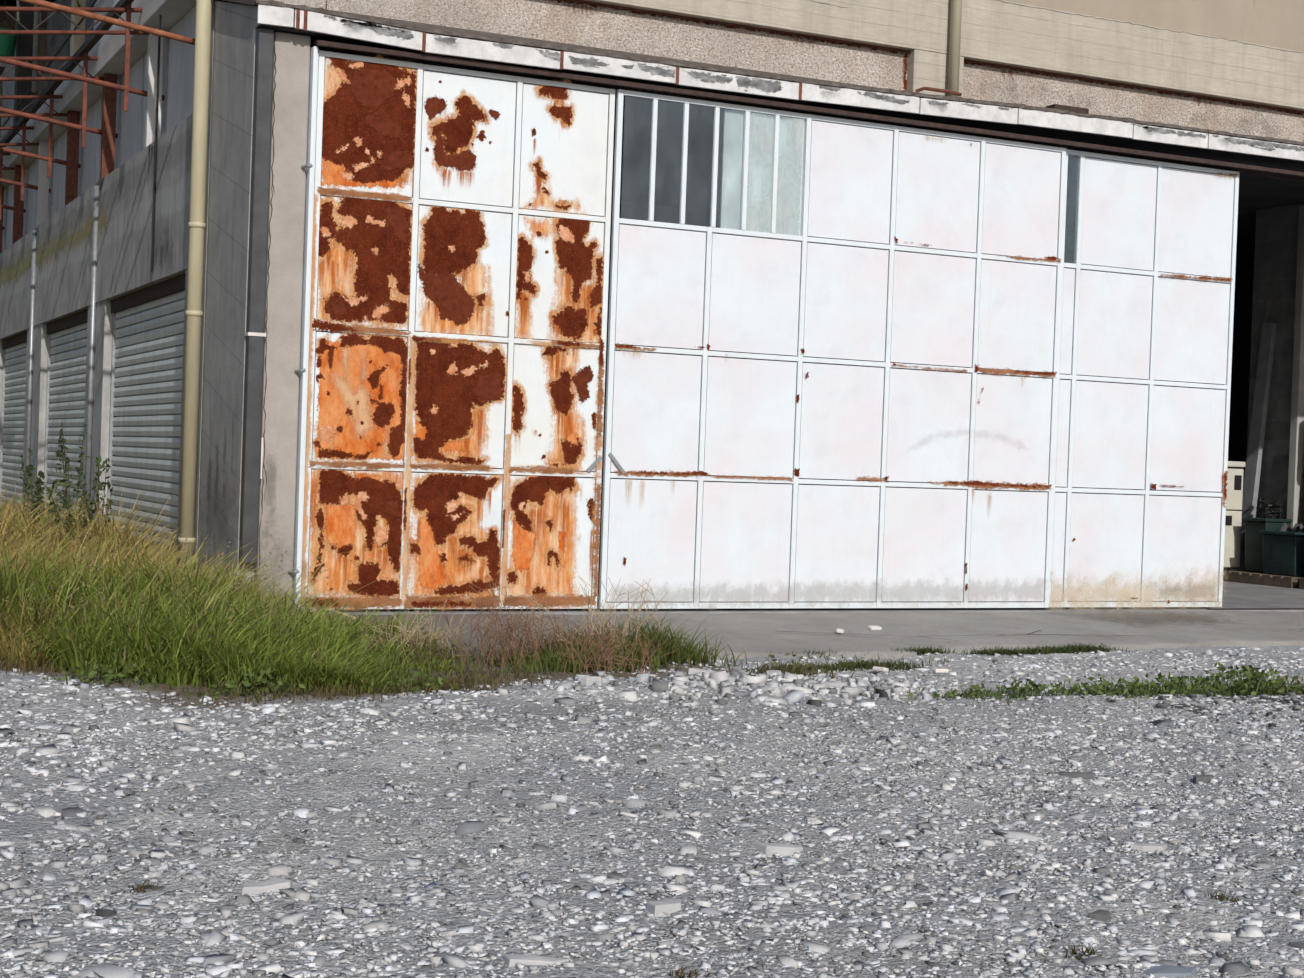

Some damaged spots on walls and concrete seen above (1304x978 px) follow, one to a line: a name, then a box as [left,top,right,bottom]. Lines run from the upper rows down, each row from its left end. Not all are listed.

rust [300,54,800,610]
rust [893,363,1057,403]
rust [929,480,1052,491]